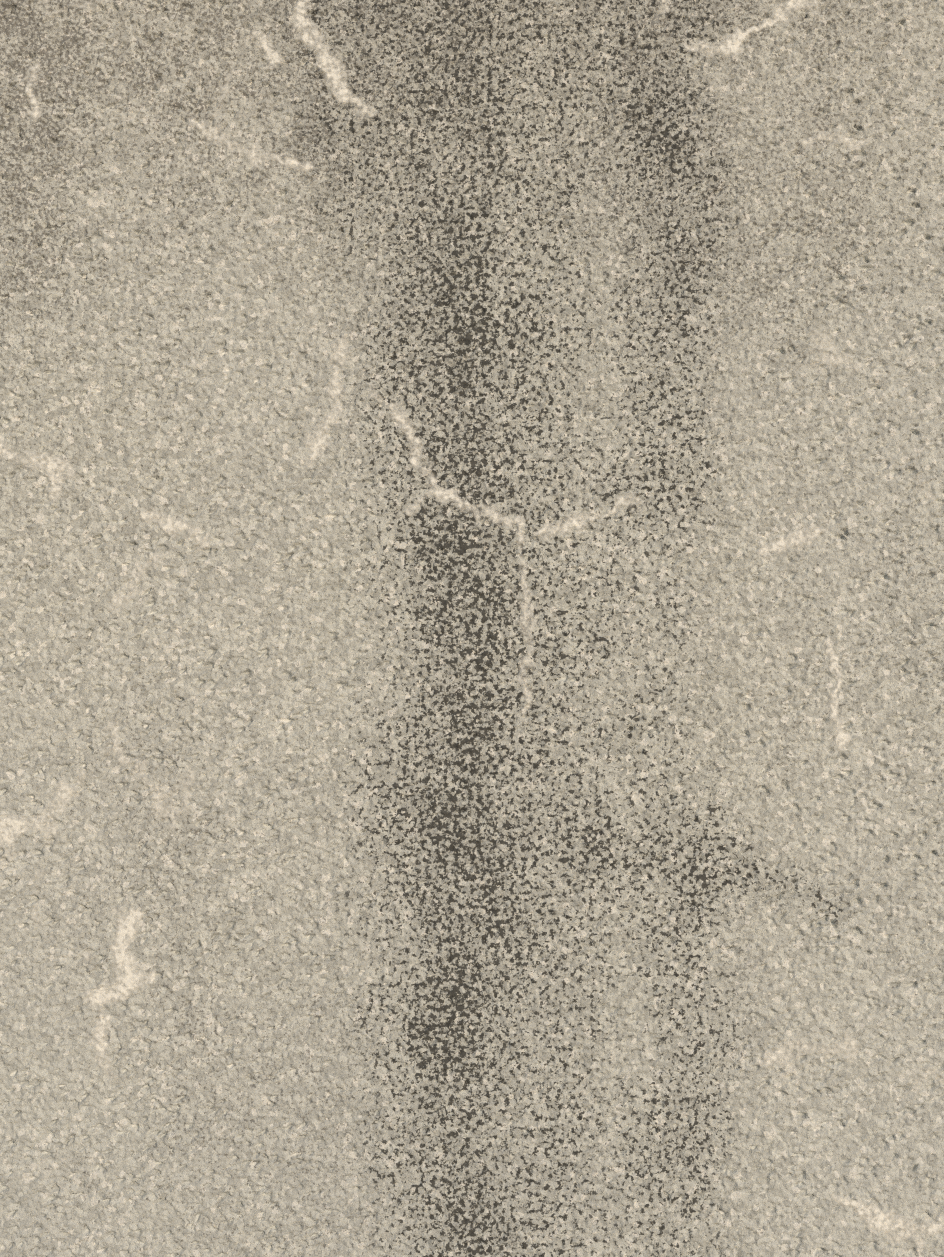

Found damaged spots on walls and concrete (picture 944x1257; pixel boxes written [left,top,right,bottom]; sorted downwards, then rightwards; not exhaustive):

crack [661,0,669,13]
crack [685,0,818,57]
crack [304,334,641,714]
leakage [277,0,845,1257]